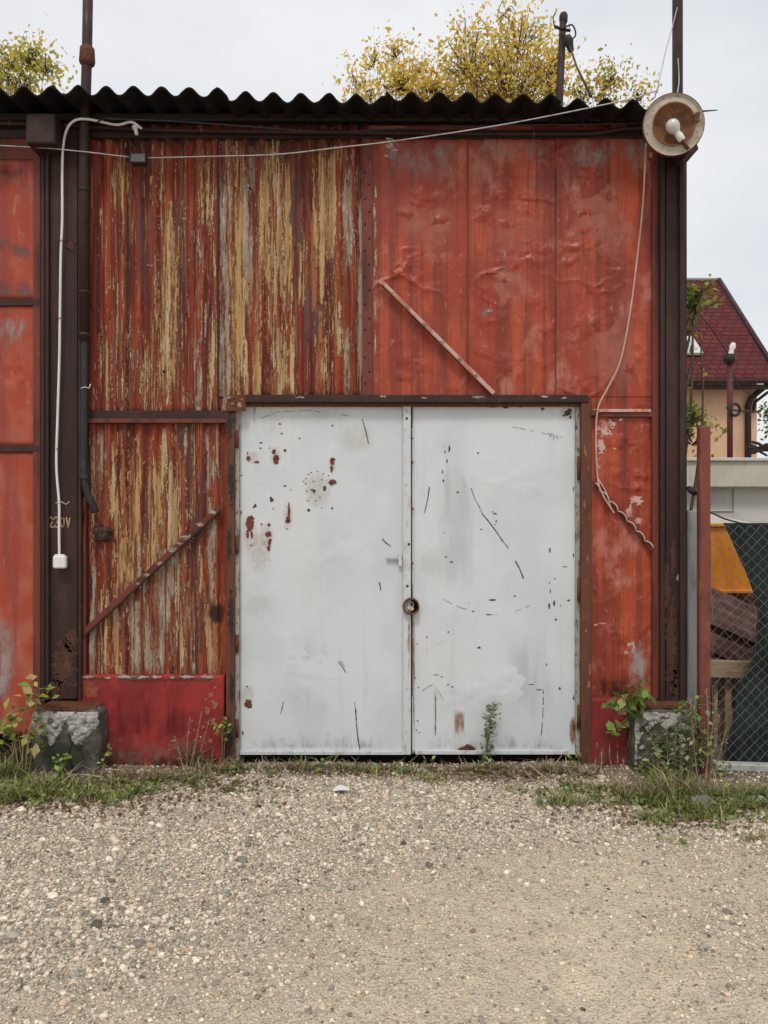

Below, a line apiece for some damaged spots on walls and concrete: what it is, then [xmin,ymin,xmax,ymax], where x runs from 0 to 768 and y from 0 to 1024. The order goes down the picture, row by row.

peeling [93,139,378,410]
rust [246,442,286,464]
peeling [584,418,624,471]
rust [245,504,272,551]
rust [303,457,337,512]
peeling [625,496,644,524]
peeling [82,423,226,744]
rust [50,626,78,701]